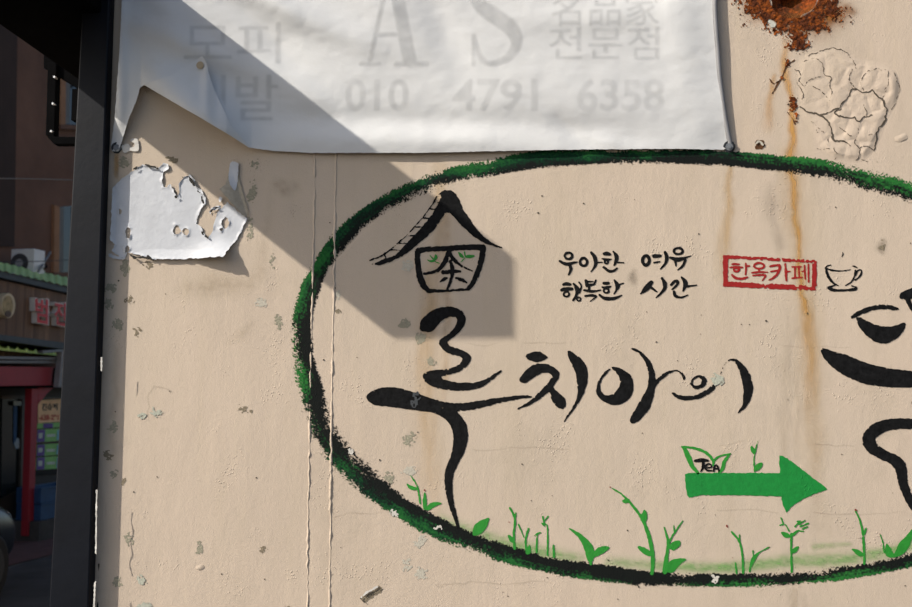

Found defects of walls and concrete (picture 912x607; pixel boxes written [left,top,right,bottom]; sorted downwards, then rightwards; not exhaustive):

rust [729,0,852,157]
peeling [104,156,259,337]
rust [790,172,807,315]